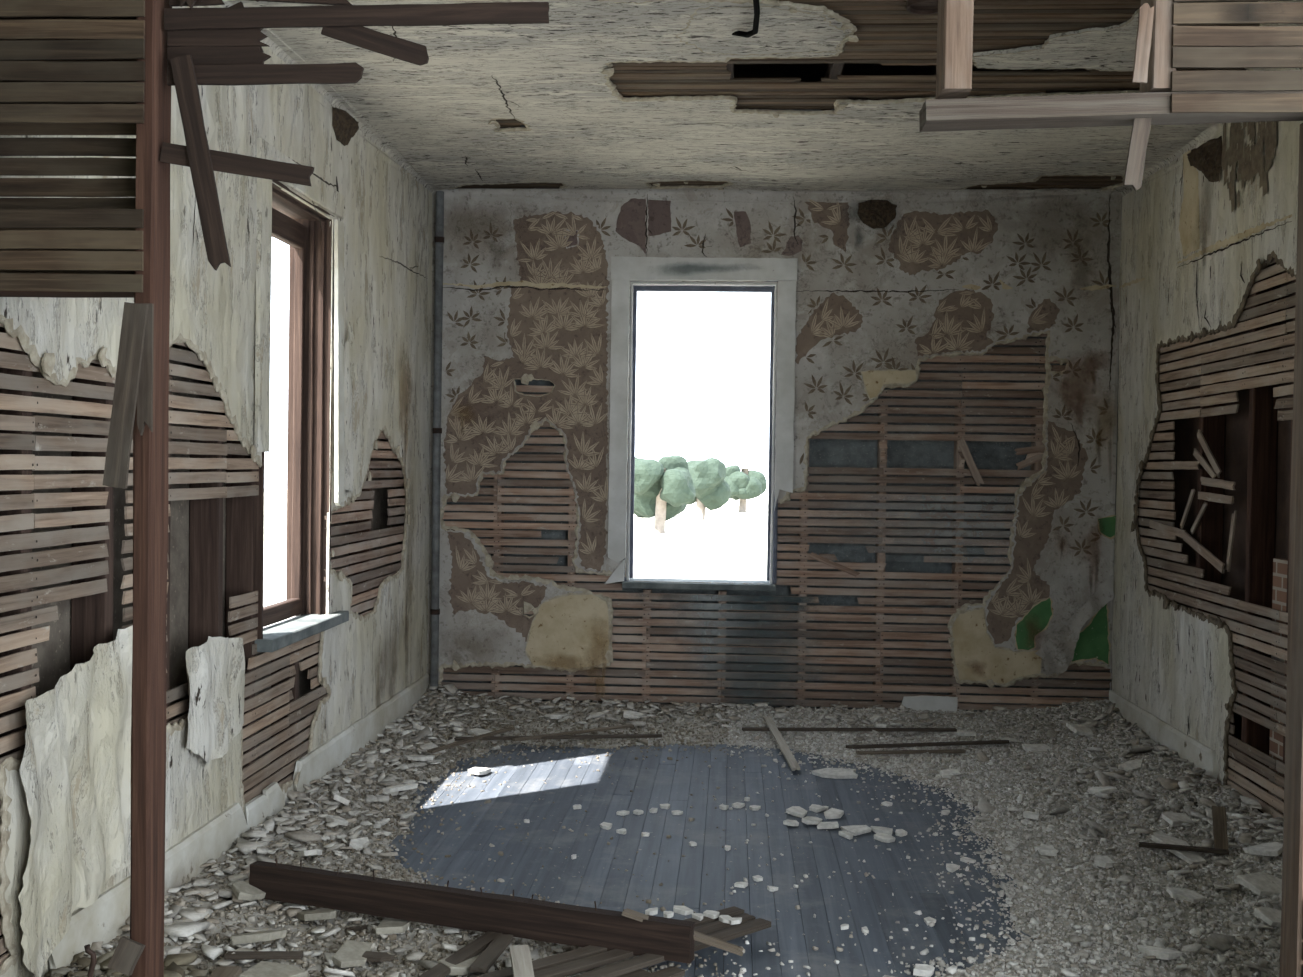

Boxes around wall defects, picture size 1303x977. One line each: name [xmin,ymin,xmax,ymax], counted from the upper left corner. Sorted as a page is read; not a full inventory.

flaking render [601,0,938,118]
flaking render [967,0,1141,98]
peeling [1178,150,1200,256]
peeling [1219,121,1277,213]
flaking render [0,314,133,976]
flaking render [166,333,332,806]
flaking render [324,426,411,622]
flaking render [438,330,1112,712]
flaking render [1098,250,1296,819]